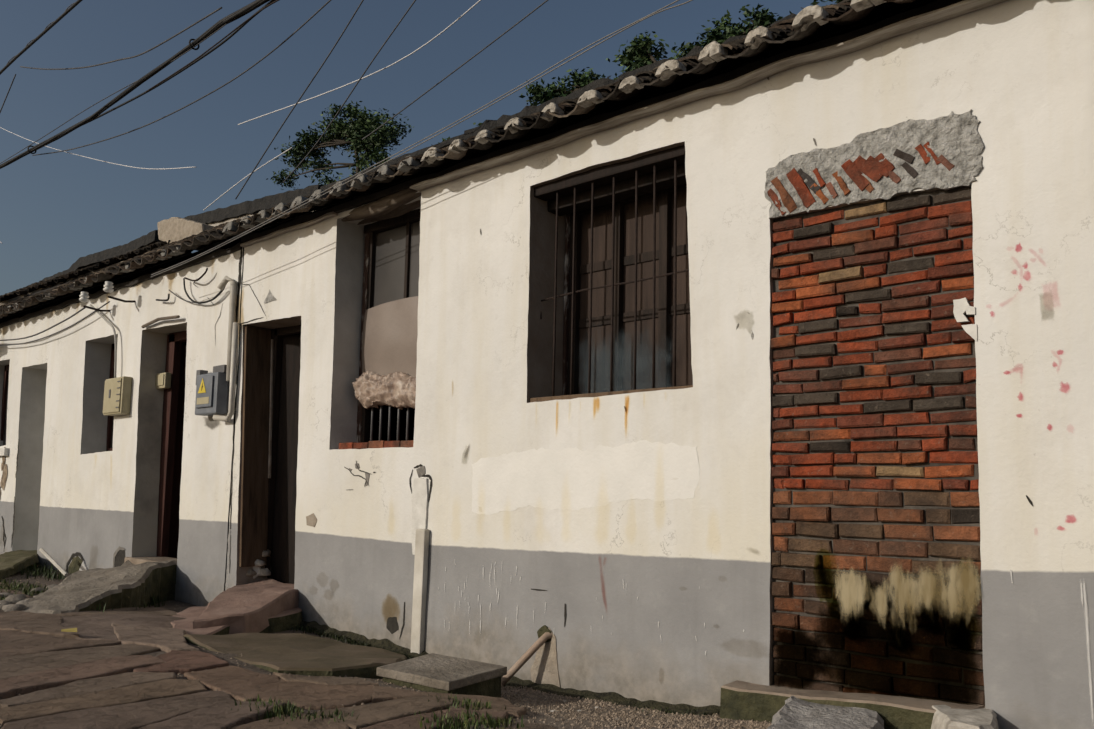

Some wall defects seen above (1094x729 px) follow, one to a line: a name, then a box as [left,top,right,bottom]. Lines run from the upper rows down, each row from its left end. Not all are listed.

peeling [0,439,19,495]
damp [772,565,977,705]